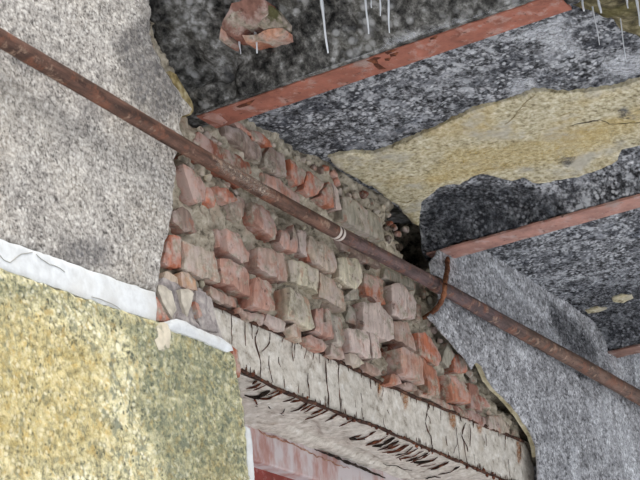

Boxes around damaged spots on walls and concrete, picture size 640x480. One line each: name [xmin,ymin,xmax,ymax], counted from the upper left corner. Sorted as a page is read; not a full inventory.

spalling [219,0,293,52]
crack [560,112,640,126]
peeling [149,20,640,273]
crack [0,252,65,272]
spalling [155,152,536,480]